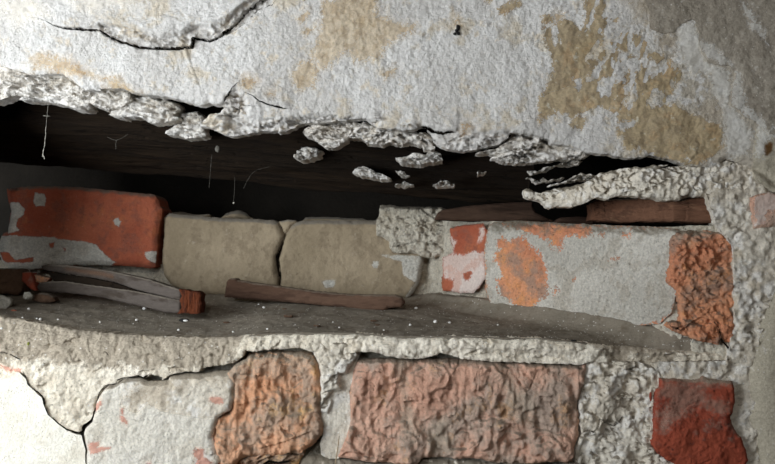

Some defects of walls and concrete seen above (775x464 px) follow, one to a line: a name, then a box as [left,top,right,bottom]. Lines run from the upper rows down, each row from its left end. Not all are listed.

crack [38,1,274,51]
efflorescence [742,2,769,45]
spalling [0,66,212,142]
peeling [536,0,725,166]
damp [659,21,775,159]
peeling [293,121,443,189]
peeling [433,180,455,189]
peeling [475,135,590,185]
spalling [279,220,298,235]
spalling [22,271,52,300]